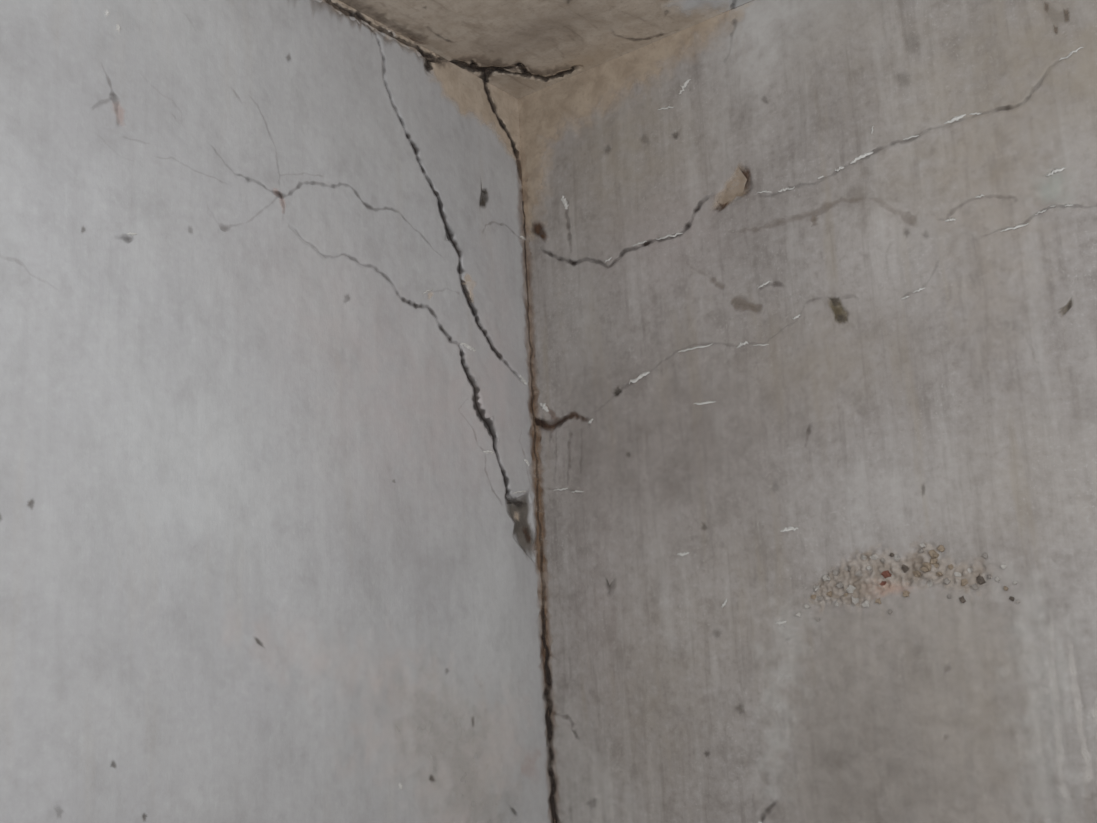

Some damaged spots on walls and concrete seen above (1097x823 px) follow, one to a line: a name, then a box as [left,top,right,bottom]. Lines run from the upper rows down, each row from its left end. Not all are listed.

peeling [331,0,729,228]
crack [944,107,1009,124]
peeling [718,167,750,209]
crack [757,151,874,193]
crack [605,205,700,262]
crack [1000,204,1073,232]
crack [679,341,769,352]
crack [629,372,650,384]
crack [325,0,593,823]
flaking render [507,496,534,552]
flaking render [776,543,1020,625]